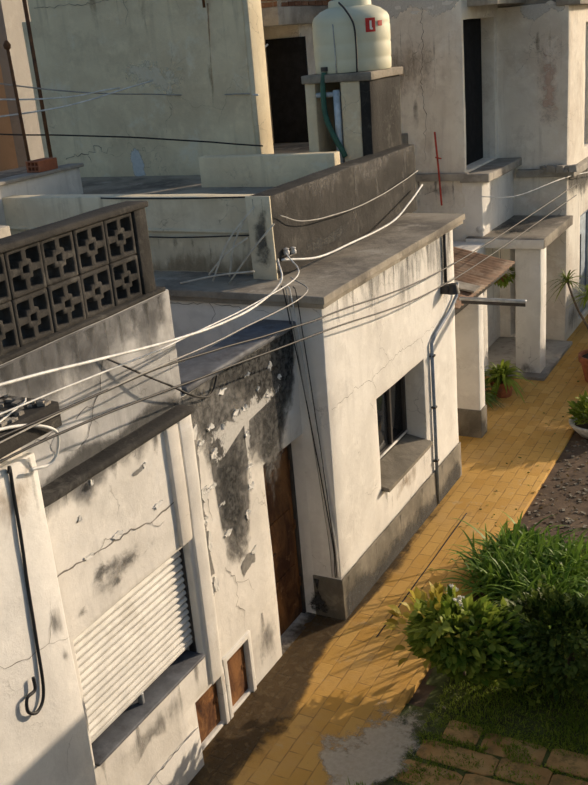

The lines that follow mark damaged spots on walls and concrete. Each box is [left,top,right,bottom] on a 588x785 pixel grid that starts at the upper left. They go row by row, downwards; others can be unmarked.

peeling [371,0,459,19]
crack [76,360,103,445]
water stain [41,330,294,559]
peeling [193,361,282,593]
crack [57,500,174,578]
water stain [99,557,132,583]